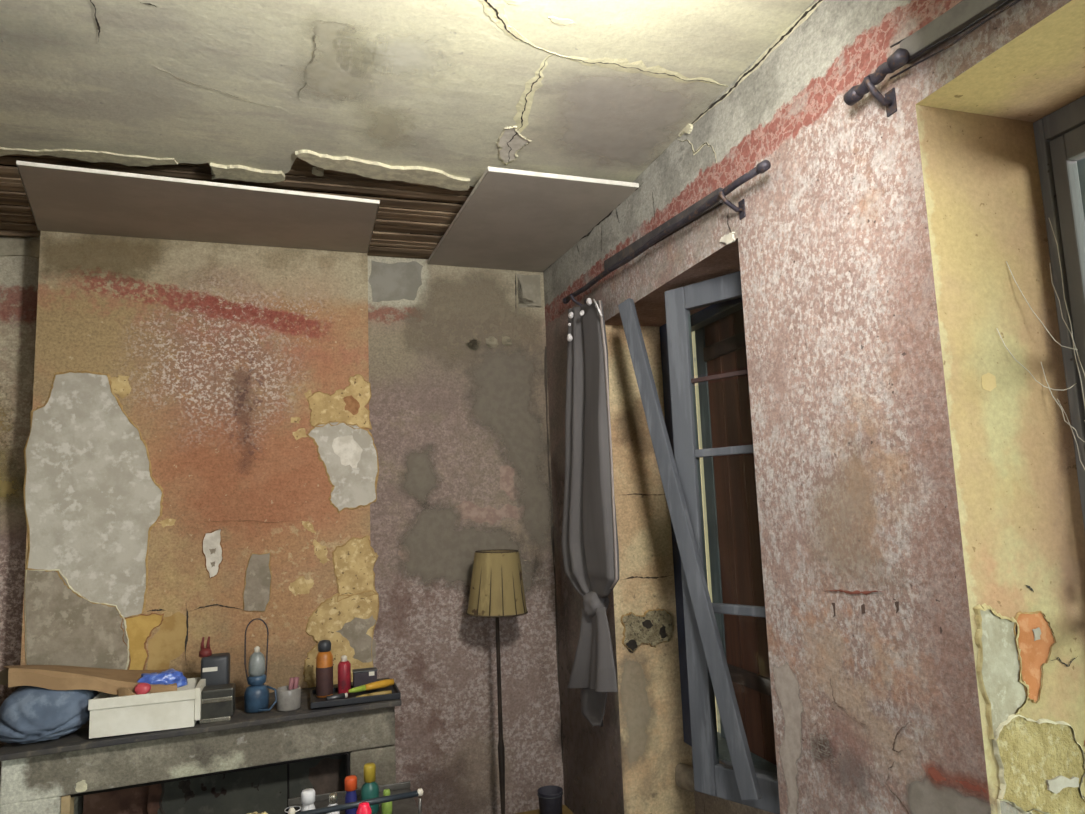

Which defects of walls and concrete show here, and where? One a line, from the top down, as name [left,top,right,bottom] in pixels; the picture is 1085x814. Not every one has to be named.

crack [90,0,100,42]
crack [479,0,824,165]
spalling [0,147,178,167]
spalling [295,150,470,191]
flaking render [291,374,379,513]
leakage [401,277,553,594]
flaking render [23,370,187,670]
peeling [202,529,223,578]
flaking render [973,603,1085,814]